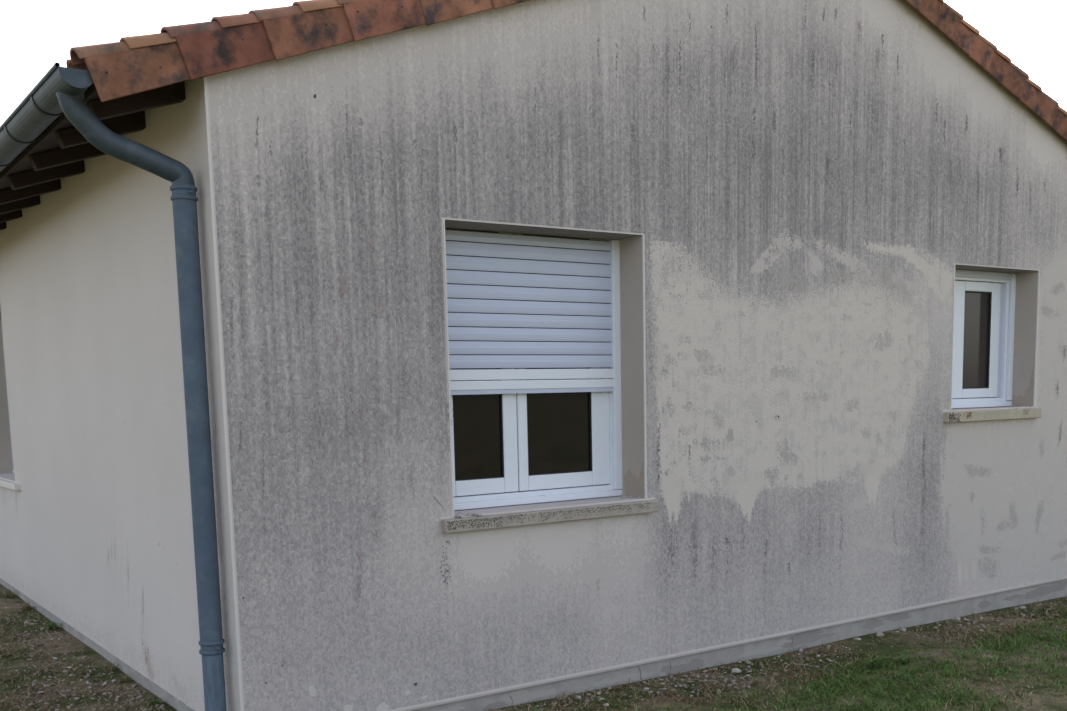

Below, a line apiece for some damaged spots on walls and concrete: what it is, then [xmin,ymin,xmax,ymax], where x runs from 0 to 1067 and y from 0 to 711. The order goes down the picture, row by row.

damp [1012,370,1034,407]
damp [210,425,223,565]
damp [624,463,645,498]
damp [862,613,910,629]